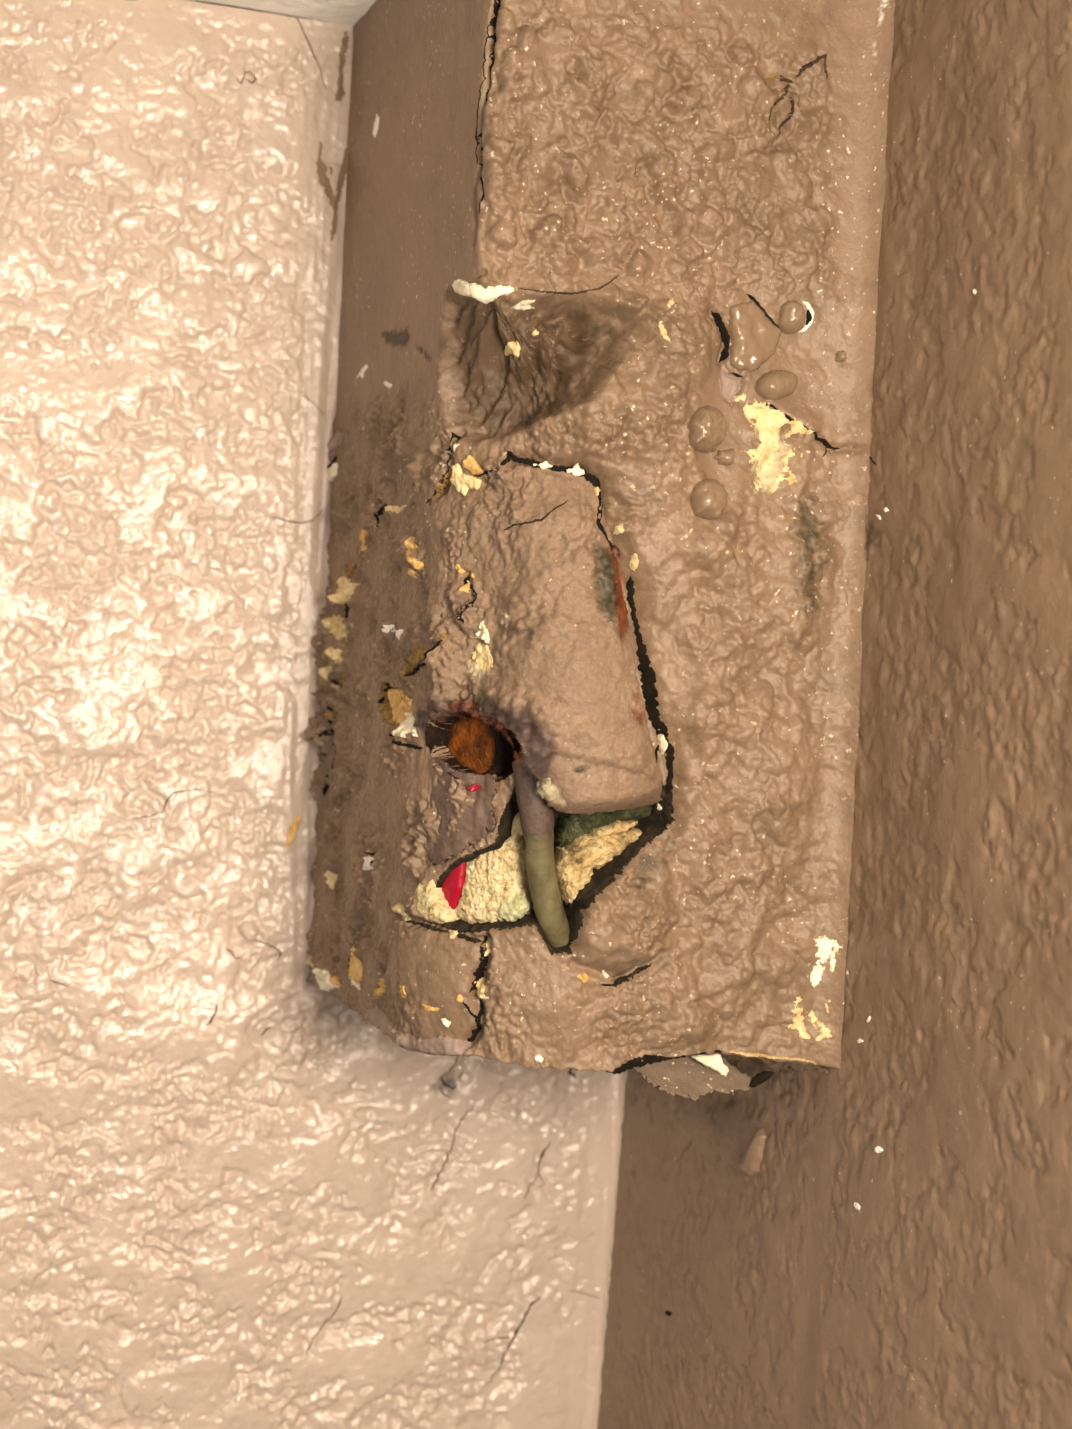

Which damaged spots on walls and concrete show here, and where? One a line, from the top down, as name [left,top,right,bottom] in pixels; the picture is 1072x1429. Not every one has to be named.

crack [475,0,500,214]
spalling [719,300,815,493]
spalling [450,443,484,496]
spalling [404,536,424,578]
spalling [467,612,511,677]
crack [373,432,675,814]
corrosion [413,697,554,782]
spalling [376,682,675,955]
spalling [577,970,610,983]
spalling [786,935,841,1041]
crack [395,912,491,1192]
peeling [633,1050,829,1102]